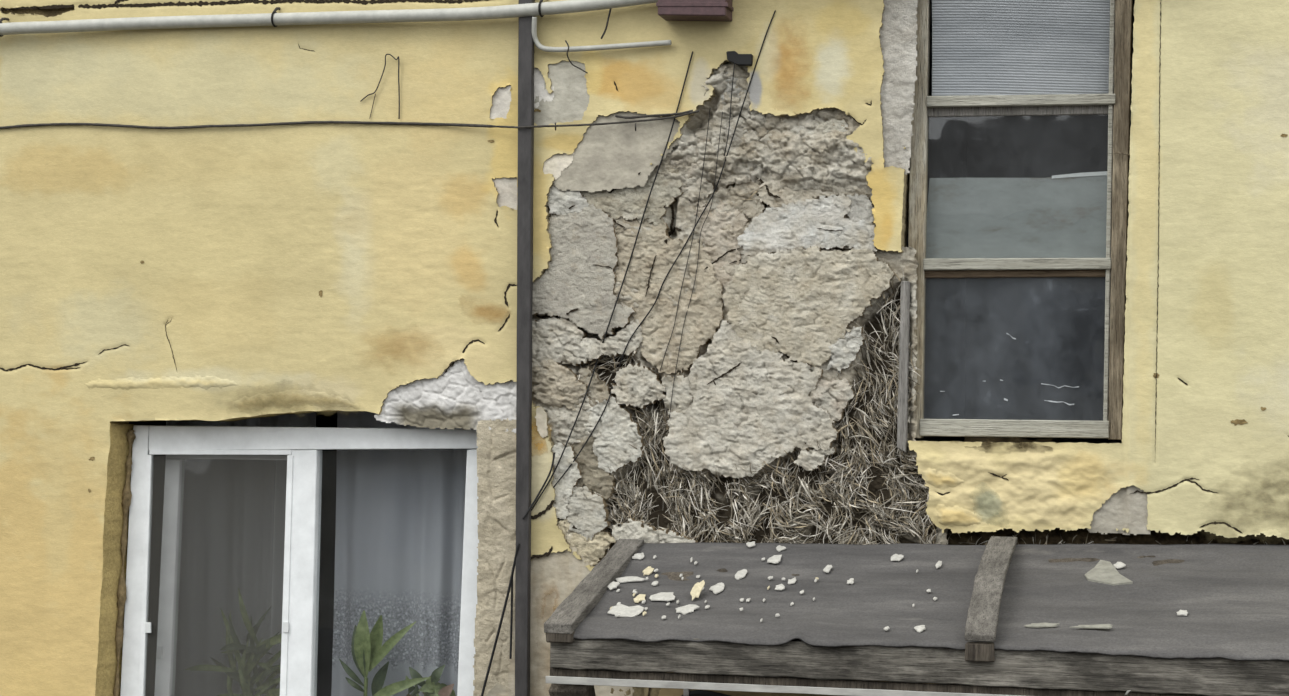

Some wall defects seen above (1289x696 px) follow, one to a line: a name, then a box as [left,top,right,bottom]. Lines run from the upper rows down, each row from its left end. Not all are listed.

crack [0,344,129,371]
flaking render [374,0,1289,696]
crack [1131,477,1242,533]